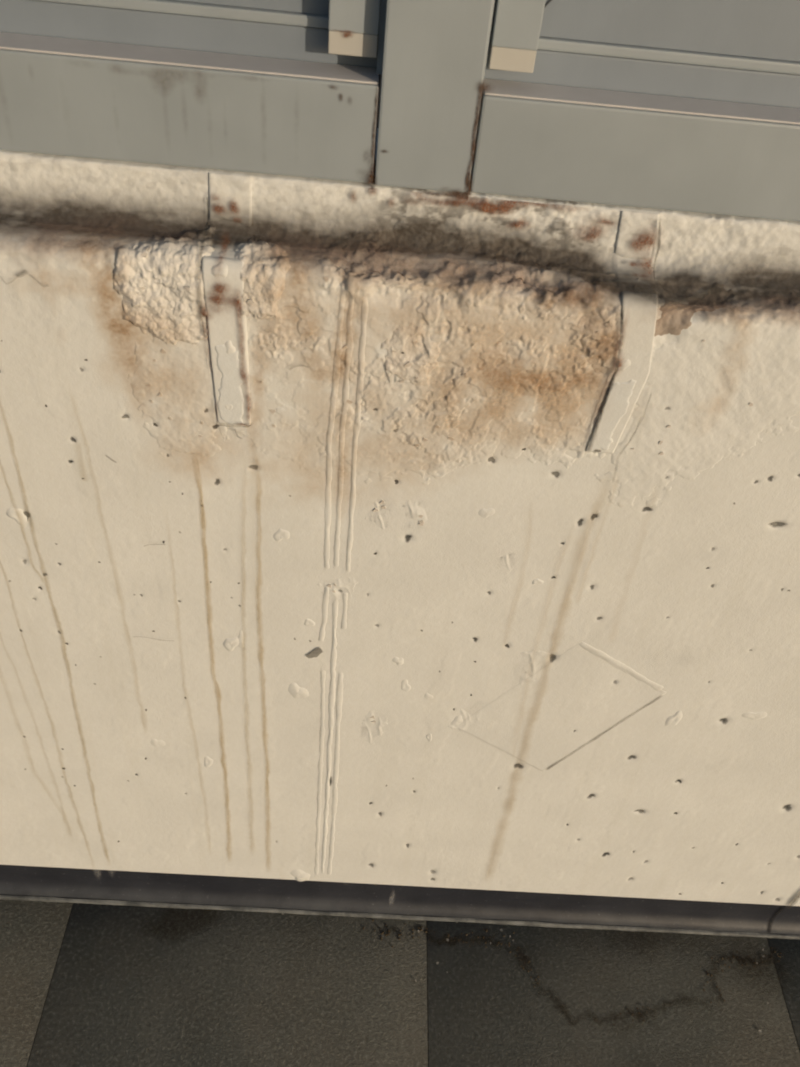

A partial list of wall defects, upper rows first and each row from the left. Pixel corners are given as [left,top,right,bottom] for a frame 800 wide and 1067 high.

corrosion [630,235,654,275]